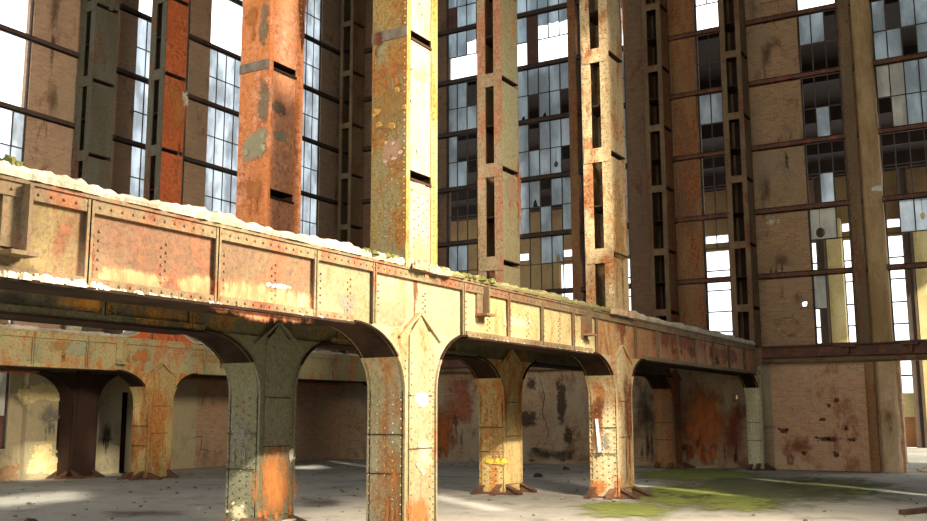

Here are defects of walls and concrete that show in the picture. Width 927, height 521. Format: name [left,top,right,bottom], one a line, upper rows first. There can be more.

corrosion [246,8,257,41]
corrosion [299,0,308,51]
peeling [243,79,286,162]
peeling [372,68,429,164]
corrosion [91,251,166,288]
corrosion [177,275,312,320]
corrosion [437,378,474,457]
corrosion [681,387,741,462]
corrosion [255,449,297,520]